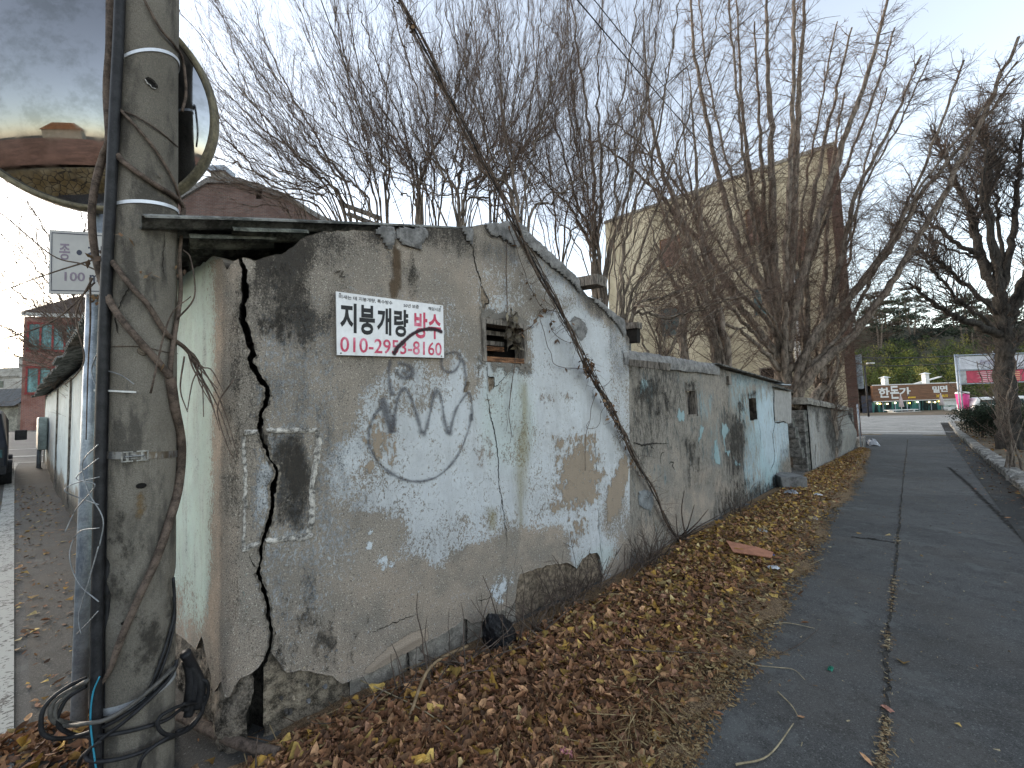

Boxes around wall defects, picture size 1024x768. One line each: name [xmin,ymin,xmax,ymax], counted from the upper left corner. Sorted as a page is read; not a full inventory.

crack [464,228,510,285]
crack [237,262,281,734]
leakage [261,432,311,532]
peeling [353,415,406,480]
peeling [366,530,396,572]
crack [477,369,507,544]
peeling [488,426,630,622]
spalling [176,619,484,754]